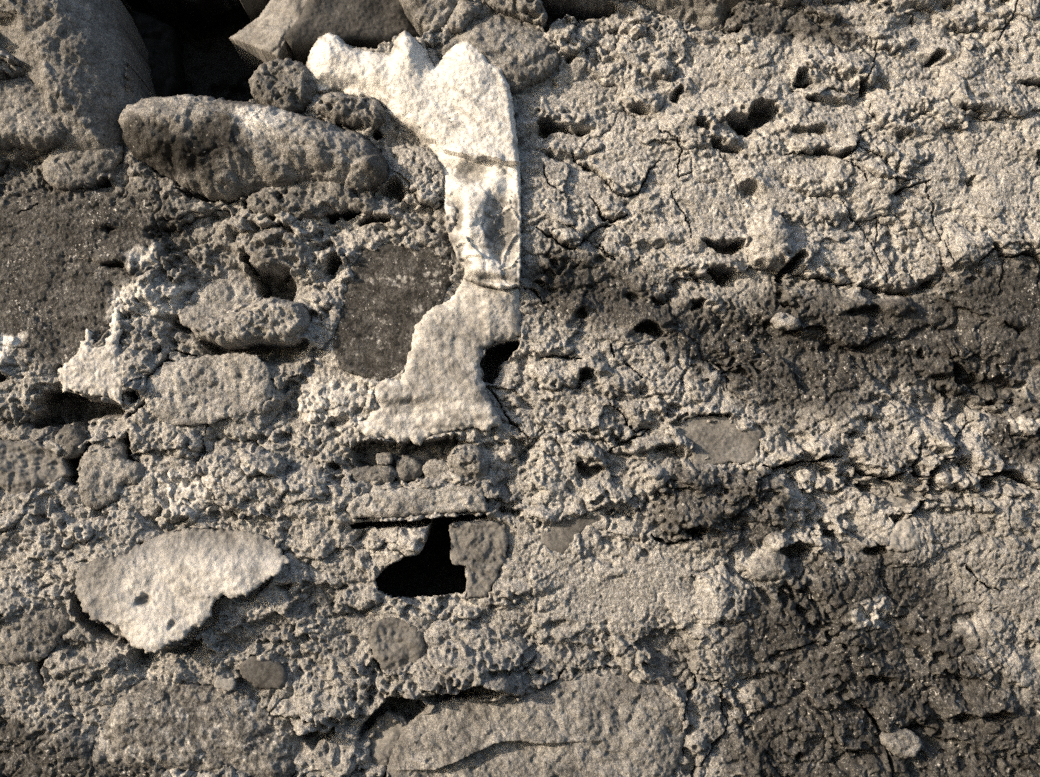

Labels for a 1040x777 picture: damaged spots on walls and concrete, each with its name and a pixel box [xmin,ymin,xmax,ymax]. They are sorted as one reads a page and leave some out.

spalling [126,0,255,102]
crack [539,129,693,263]
crack [791,42,1040,296]
crack [608,403,651,453]
crack [764,421,1040,521]
spalling [350,514,487,598]